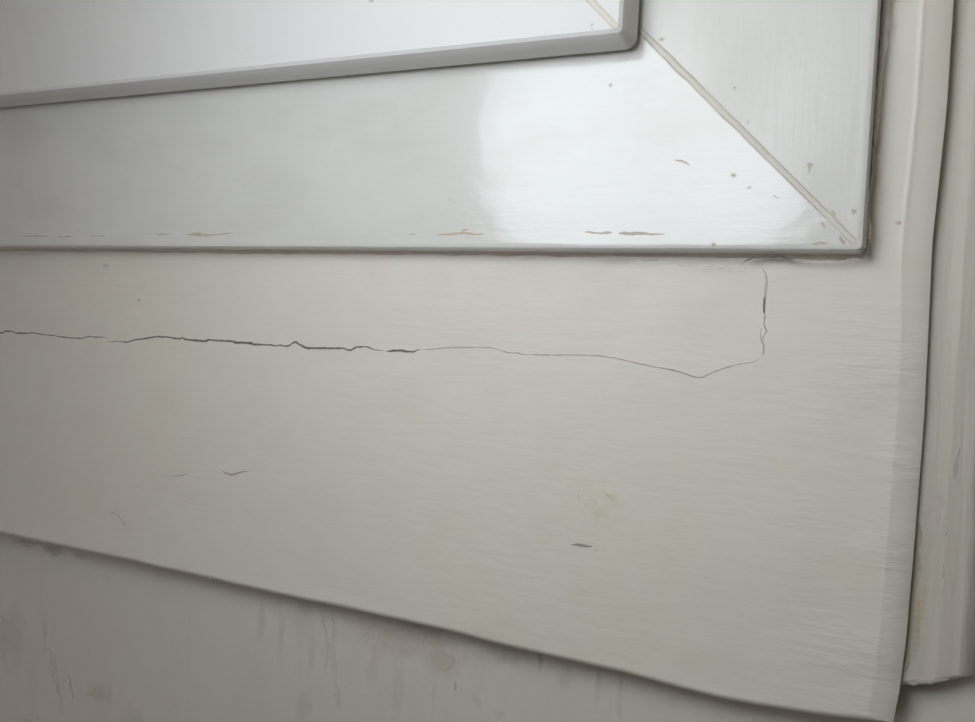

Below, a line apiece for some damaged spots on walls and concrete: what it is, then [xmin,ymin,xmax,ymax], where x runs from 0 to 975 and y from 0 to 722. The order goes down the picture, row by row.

crack [0,255,795,378]